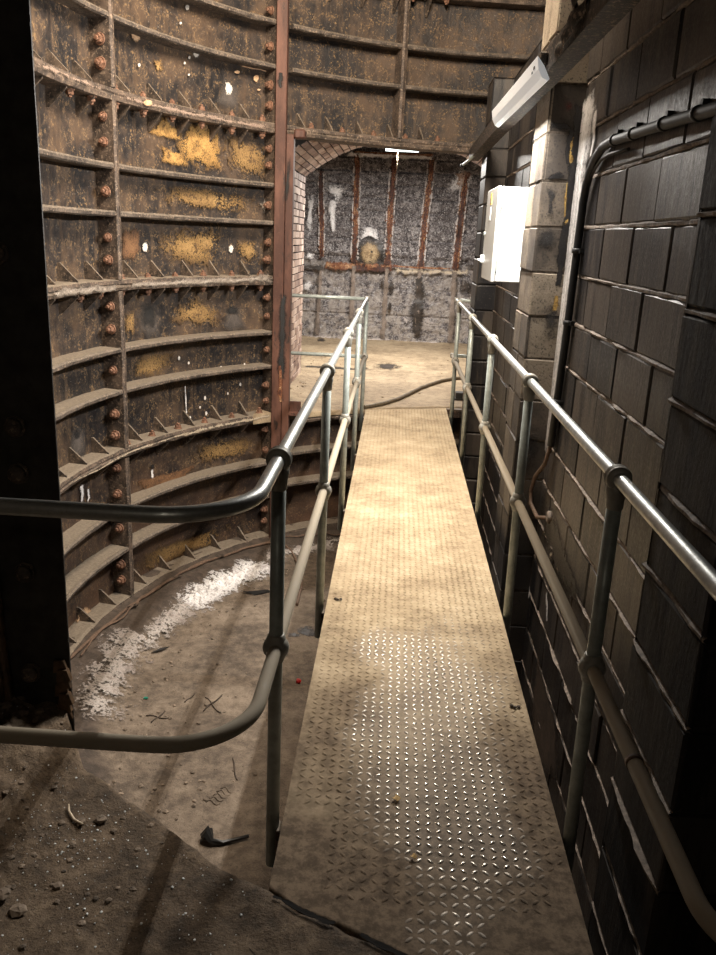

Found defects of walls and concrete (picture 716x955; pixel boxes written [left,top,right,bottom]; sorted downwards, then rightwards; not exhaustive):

damp [327,183,344,232]
rust [304,153,471,342]
rust [277,295,287,402]